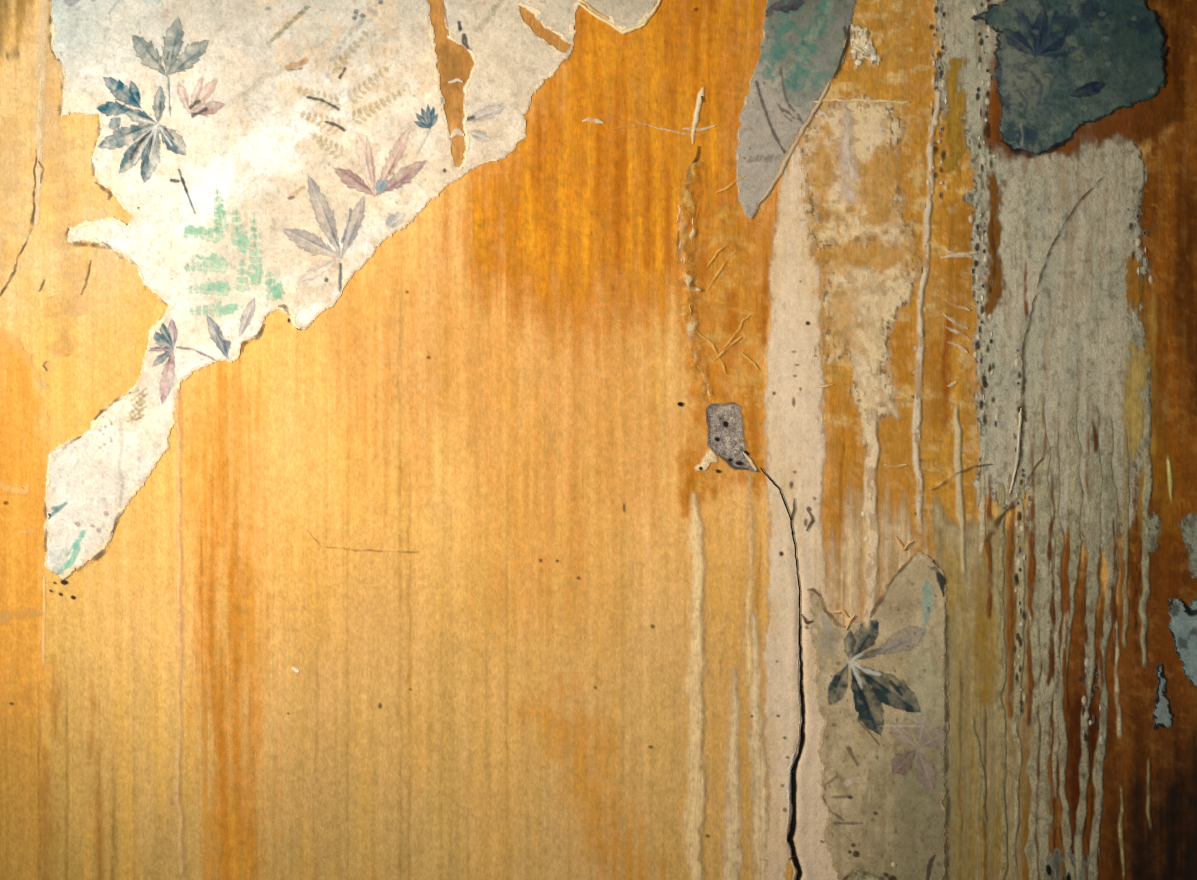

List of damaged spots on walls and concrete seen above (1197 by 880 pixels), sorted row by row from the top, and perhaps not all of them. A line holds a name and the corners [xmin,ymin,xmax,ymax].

crack [0,158,42,295]
water stain [470,0,767,324]
peeling [849,24,880,69]
crack [760,467,814,880]
peeling [695,95,925,880]
water stain [933,499,1036,880]
peeling [925,0,1160,880]
water stain [1131,738,1197,880]